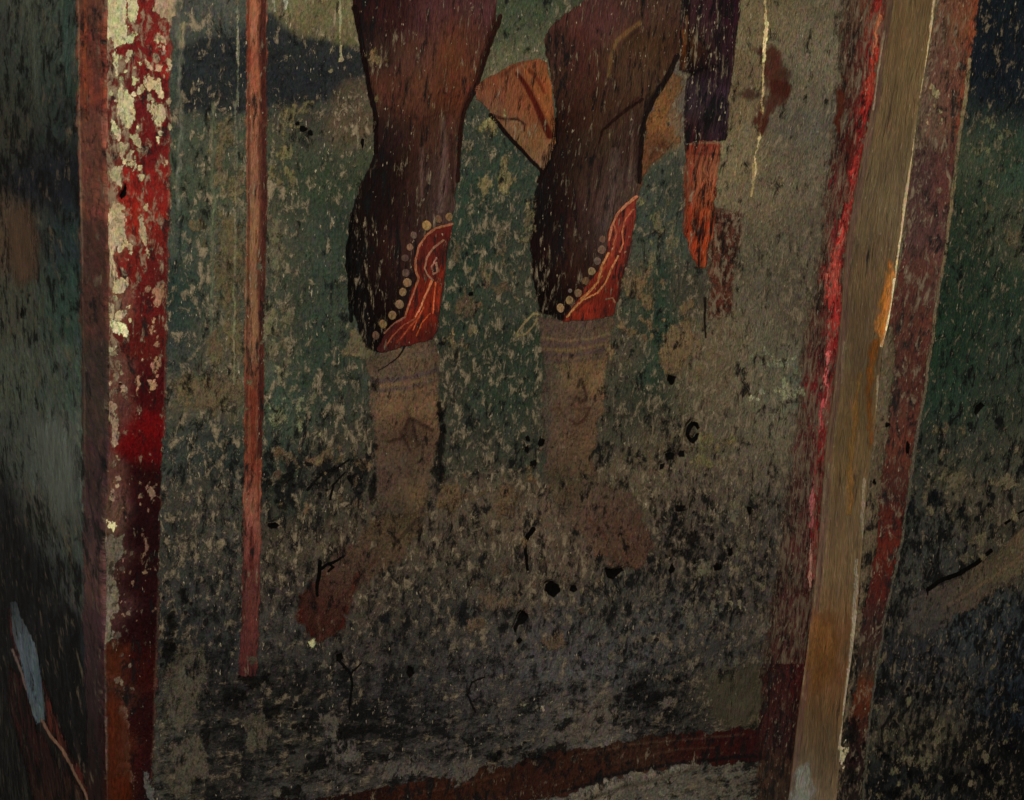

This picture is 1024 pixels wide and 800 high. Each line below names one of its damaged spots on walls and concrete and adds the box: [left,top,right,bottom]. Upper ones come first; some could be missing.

peeling [107,0,252,512]